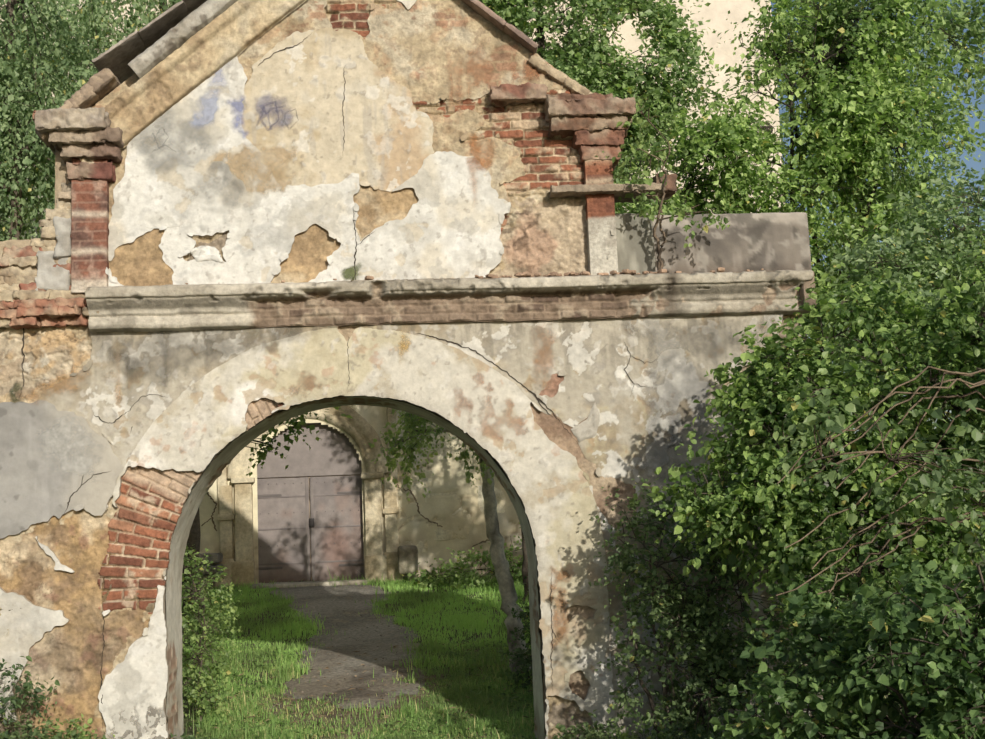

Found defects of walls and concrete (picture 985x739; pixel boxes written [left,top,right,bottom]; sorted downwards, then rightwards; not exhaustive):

spalling [0,463,204,739]